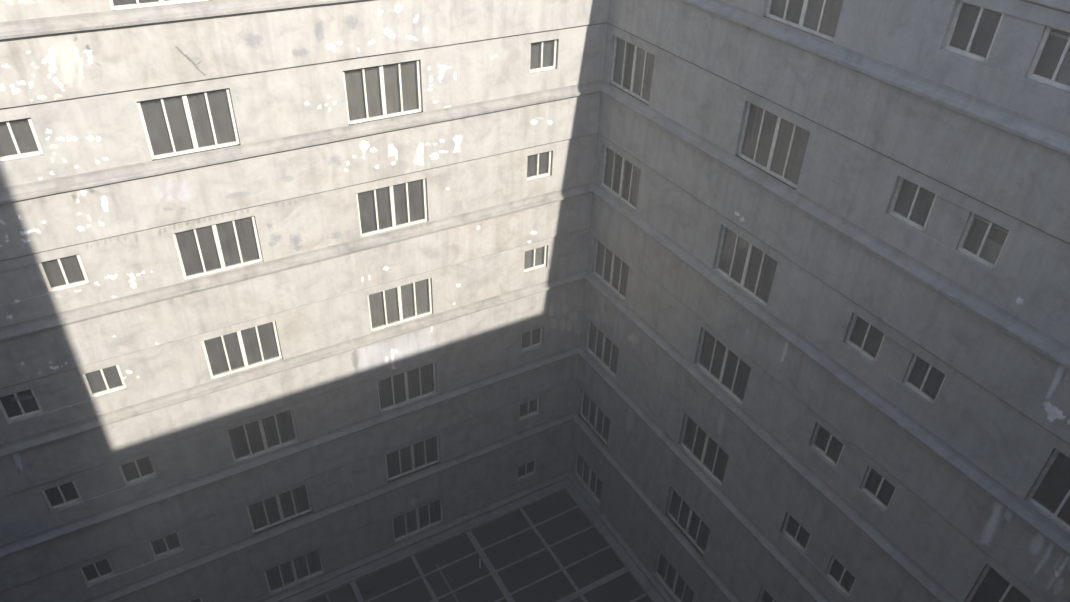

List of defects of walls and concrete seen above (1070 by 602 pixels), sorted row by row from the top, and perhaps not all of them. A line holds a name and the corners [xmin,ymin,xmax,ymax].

peeling [0,47,65,102]
peeling [345,141,398,172]
peeling [413,135,462,166]
peeling [1043,401,1070,425]